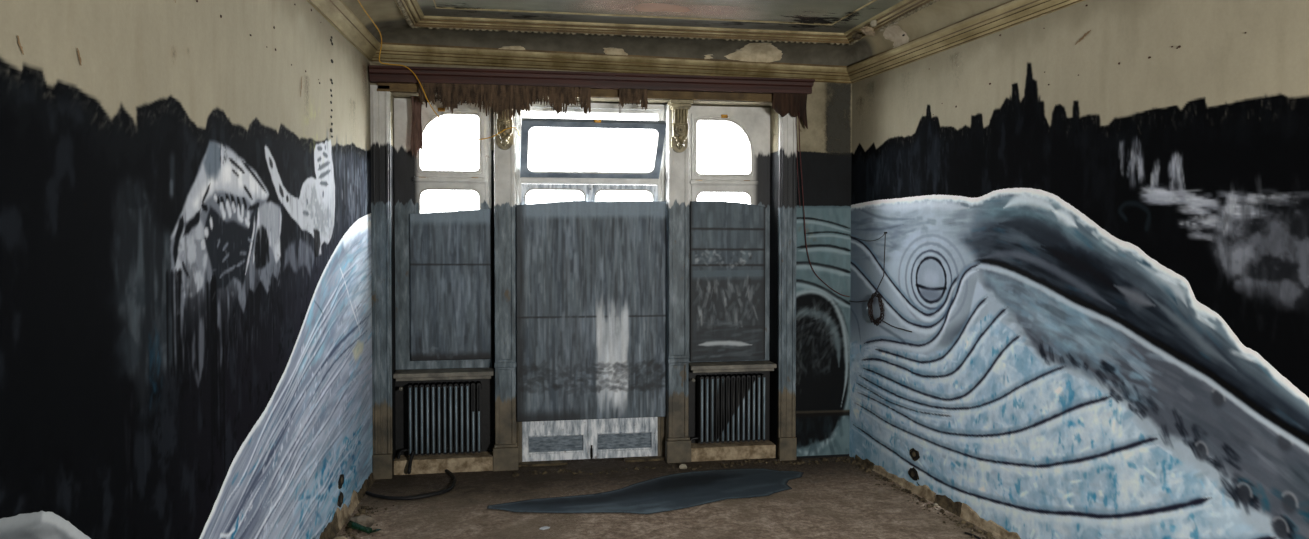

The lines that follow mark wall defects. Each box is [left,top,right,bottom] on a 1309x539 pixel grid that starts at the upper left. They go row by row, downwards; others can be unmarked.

flaking render [319,473,375,539]